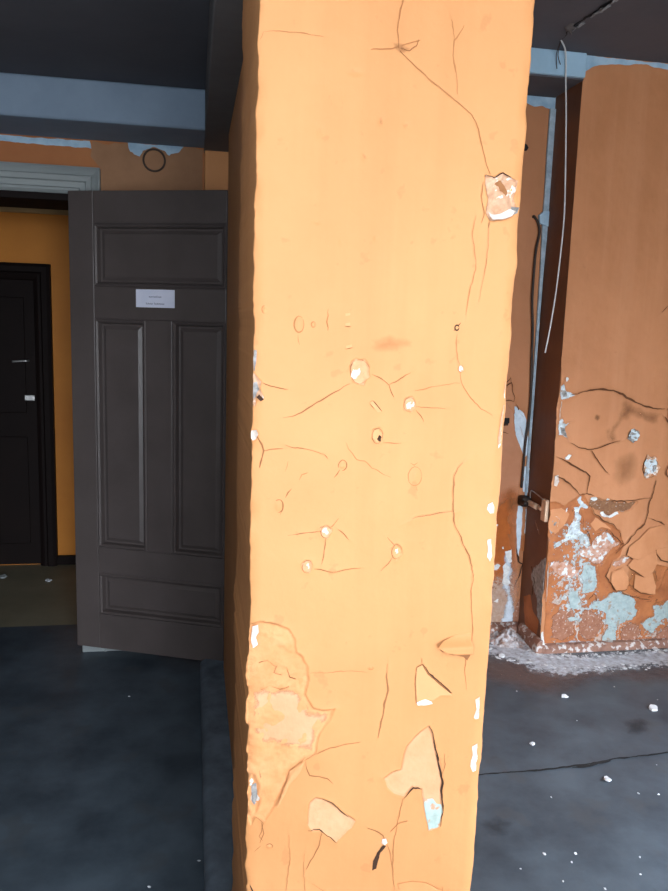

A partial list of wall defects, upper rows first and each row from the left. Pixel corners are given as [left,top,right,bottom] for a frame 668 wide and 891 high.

spalling [400,51,519,228]
spalling [284,359,410,418]
peeling [487,56,668,654]
crack [571,388,668,422]
crack [415,467,473,578]
crack [557,441,618,496]
crack [616,467,668,553]
peeling [246,621,359,841]
peeling [306,798,355,869]
crack [368,821,407,870]
peeling [385,726,445,884]
crack [479,752,668,775]